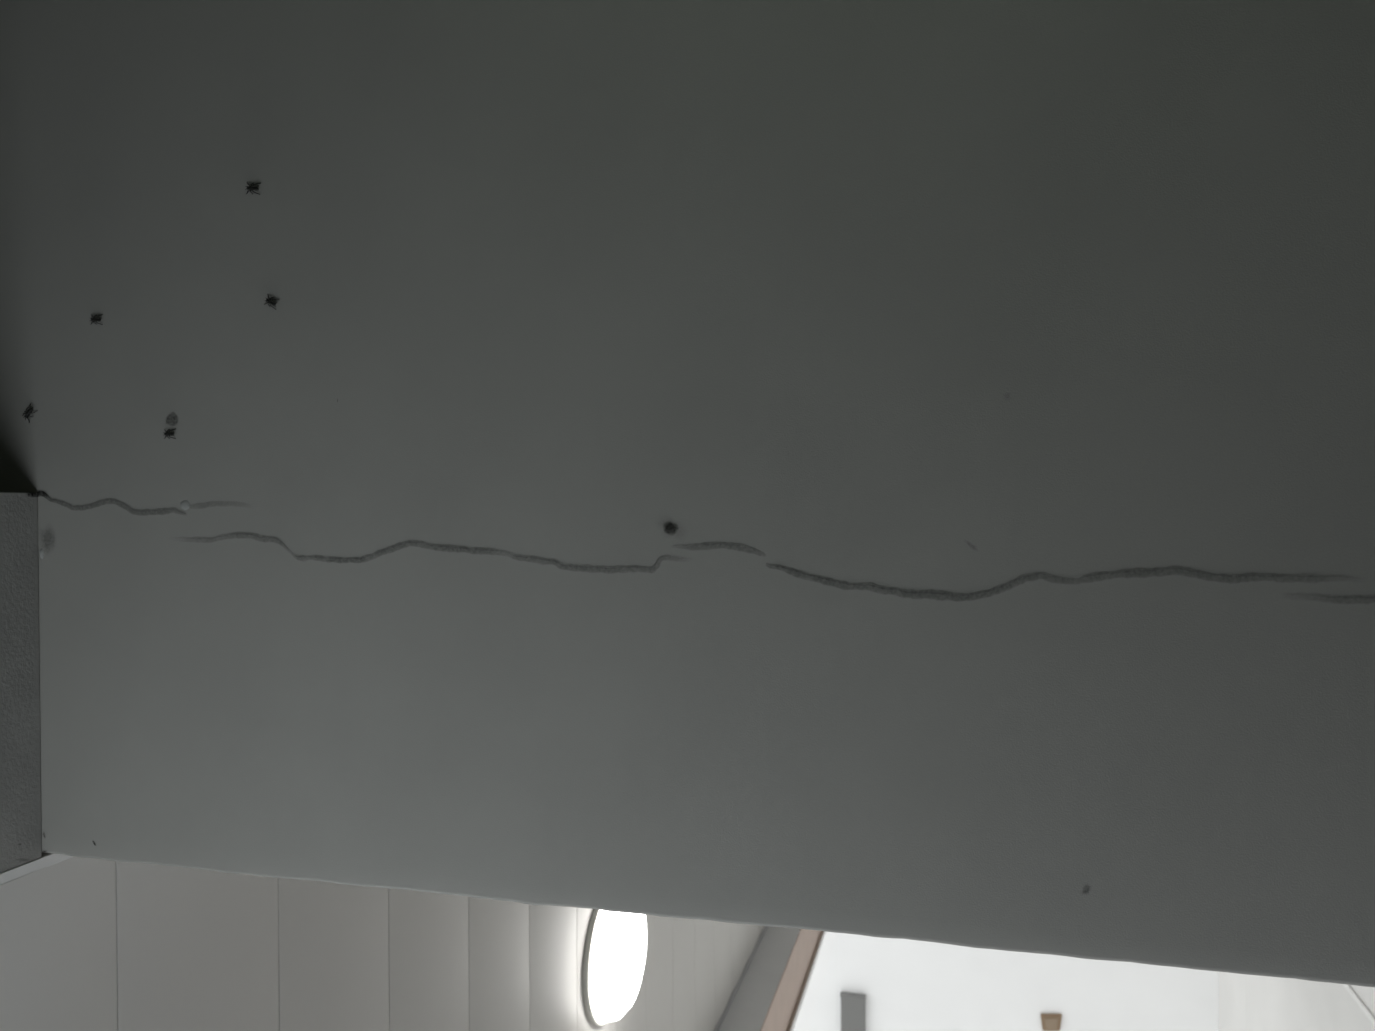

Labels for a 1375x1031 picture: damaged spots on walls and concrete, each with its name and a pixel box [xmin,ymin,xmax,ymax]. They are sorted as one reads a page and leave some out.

crack [28,491,167,514]
crack [320,542,481,562]
crack [776,565,1025,599]